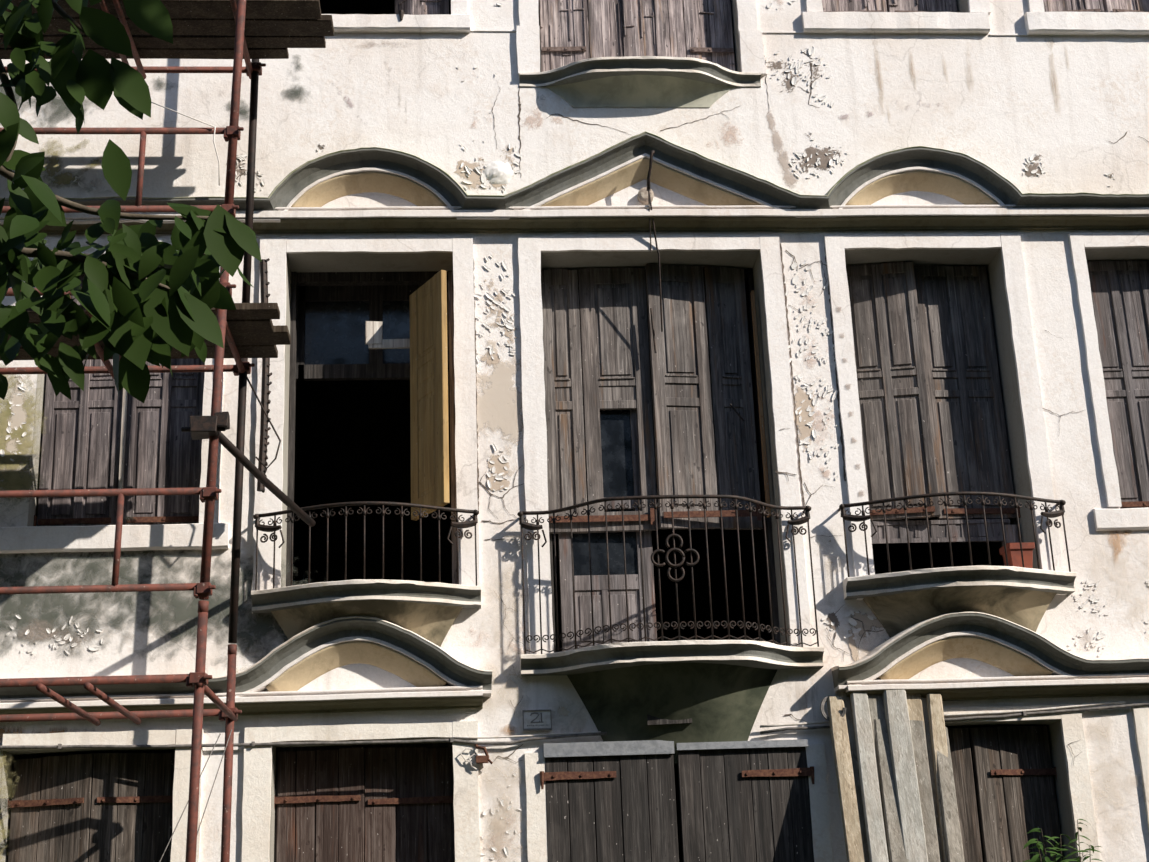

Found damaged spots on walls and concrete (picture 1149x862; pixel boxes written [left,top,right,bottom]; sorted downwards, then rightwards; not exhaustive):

peeling [765,46,834,107]
crack [798,50,821,108]
spalling [454,144,522,192]
crack [492,80,521,167]
crack [547,114,631,135]
leakage [38,131,1149,235]
crack [764,56,797,186]
spalling [790,132,848,178]
spalling [1023,153,1047,177]
peeling [474,255,524,491]
peeling [784,260,839,480]